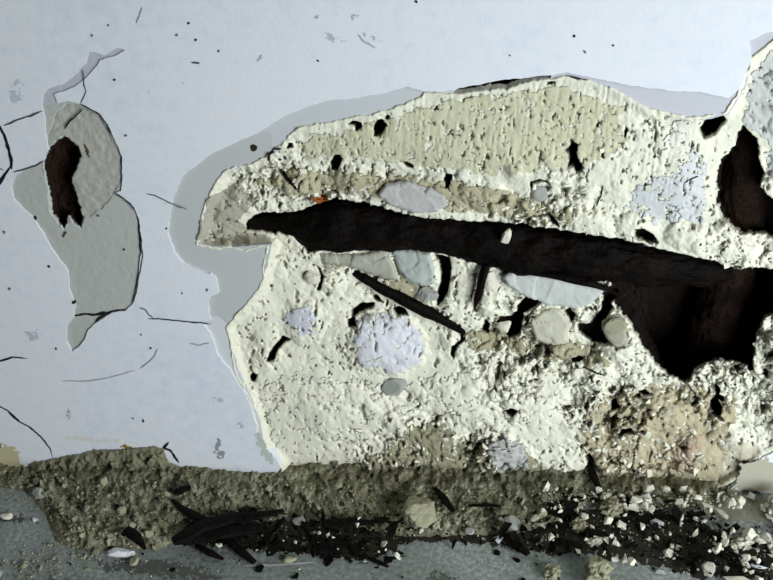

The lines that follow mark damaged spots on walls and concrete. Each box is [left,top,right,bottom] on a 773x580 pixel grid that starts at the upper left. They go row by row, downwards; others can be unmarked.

crack [0,111,43,185]
rust [44,137,90,238]
peeling [12,48,142,350]
spalling [168,31,773,488]
crack [66,349,158,382]
crack [0,406,53,457]
crack [163,442,179,463]